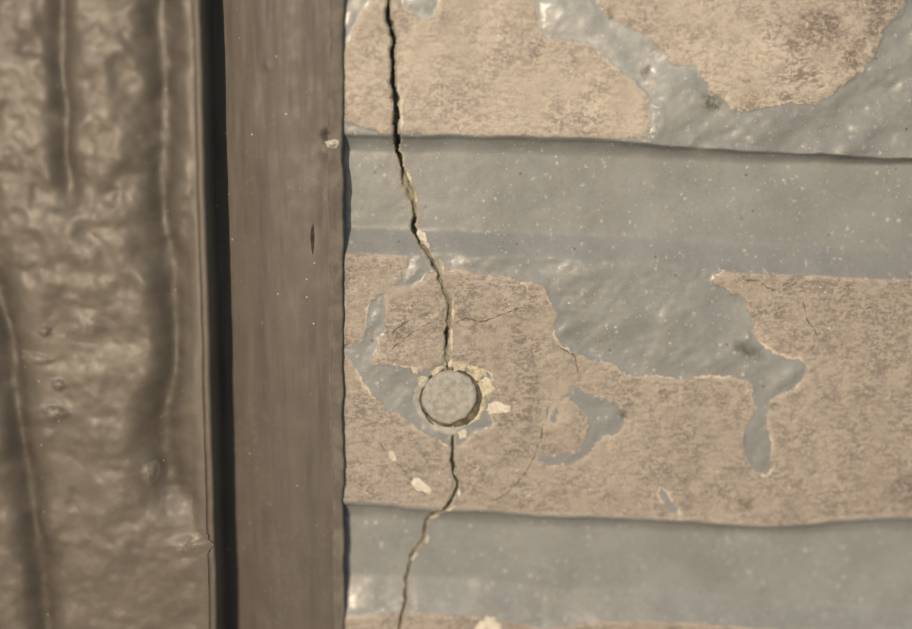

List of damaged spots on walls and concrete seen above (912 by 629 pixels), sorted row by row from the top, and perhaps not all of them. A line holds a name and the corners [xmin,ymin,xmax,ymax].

peeling [343,0,912,160]
crack [382,0,518,371]
peeling [344,293,511,447]
peeling [394,254,806,477]
crack [380,425,461,629]
peeling [475,616,502,629]